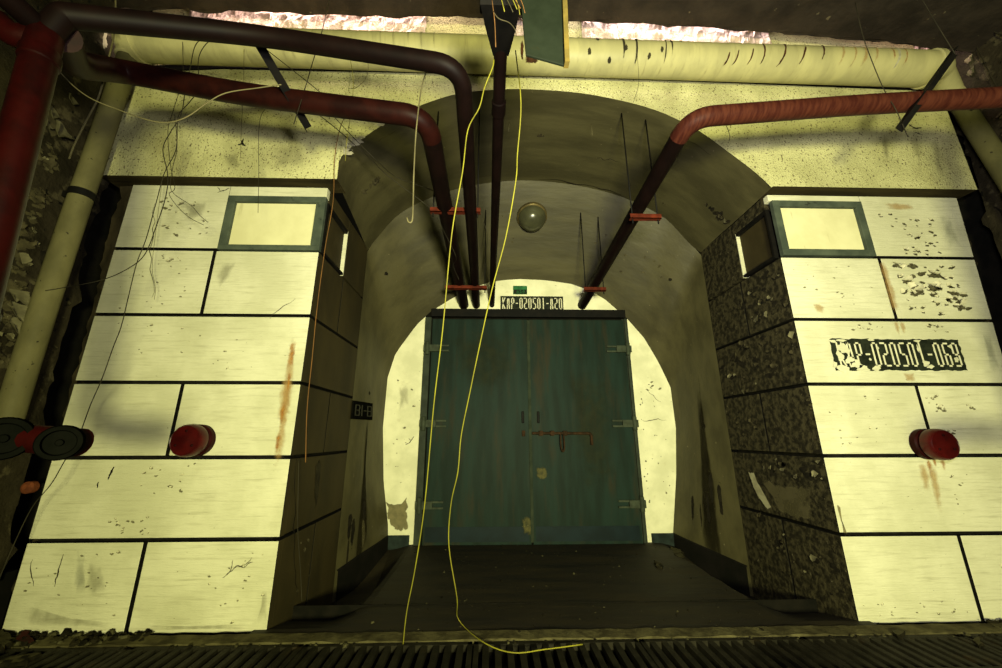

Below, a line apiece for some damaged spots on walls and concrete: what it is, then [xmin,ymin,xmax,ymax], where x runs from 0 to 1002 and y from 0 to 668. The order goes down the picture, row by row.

peeling [878,212,972,333]